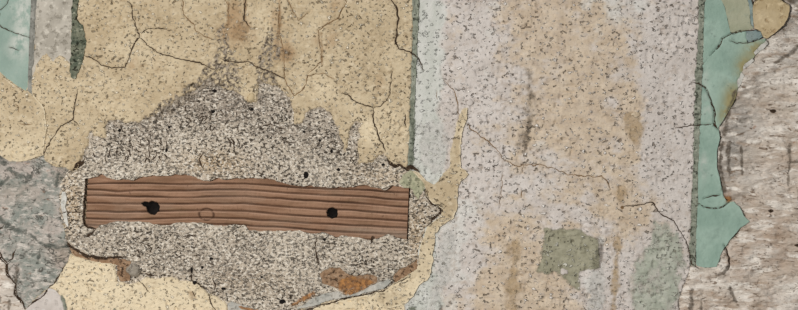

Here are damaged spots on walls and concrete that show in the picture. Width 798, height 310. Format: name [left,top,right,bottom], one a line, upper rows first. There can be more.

crack [84,0,347,96]
crack [391,0,424,72]
crack [44,89,79,154]
spalling [0,0,469,310]
crack [343,71,443,225]
crack [436,85,611,203]
spalling [632,0,798,310]
crack [624,202,698,268]
rust [339,277,373,295]